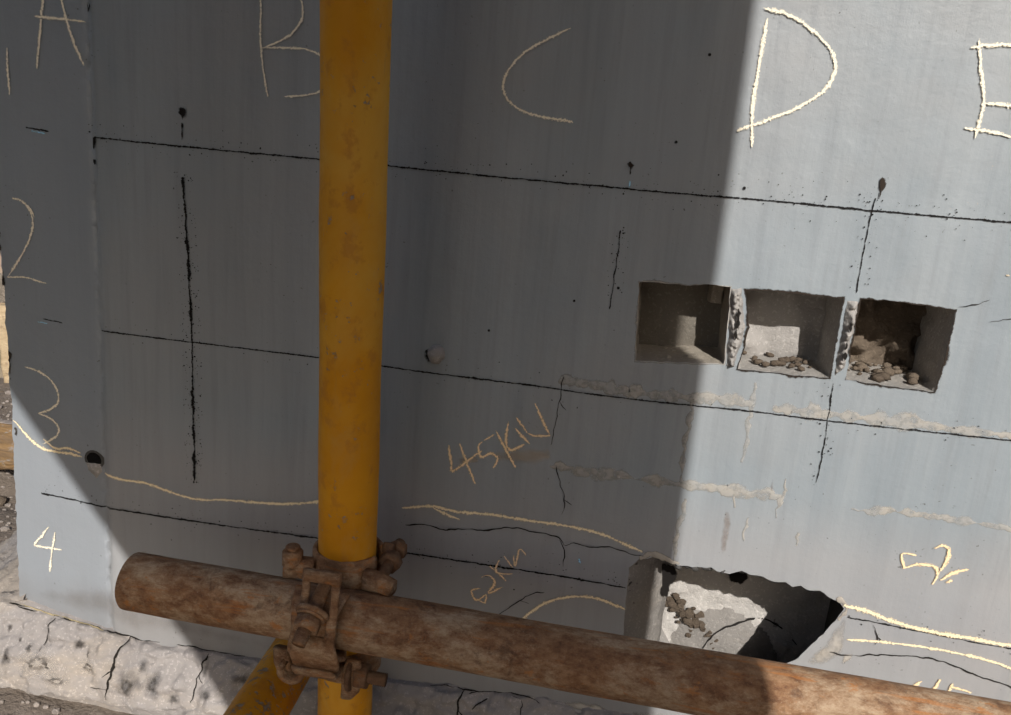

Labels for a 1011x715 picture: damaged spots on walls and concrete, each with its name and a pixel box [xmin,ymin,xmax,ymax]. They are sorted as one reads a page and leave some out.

crack [551,377,566,444]
crack [408,467,641,562]
crack [10,602,241,703]
crack [430,684,540,715]
spalling [624,557,848,663]
crack [830,625,1011,688]